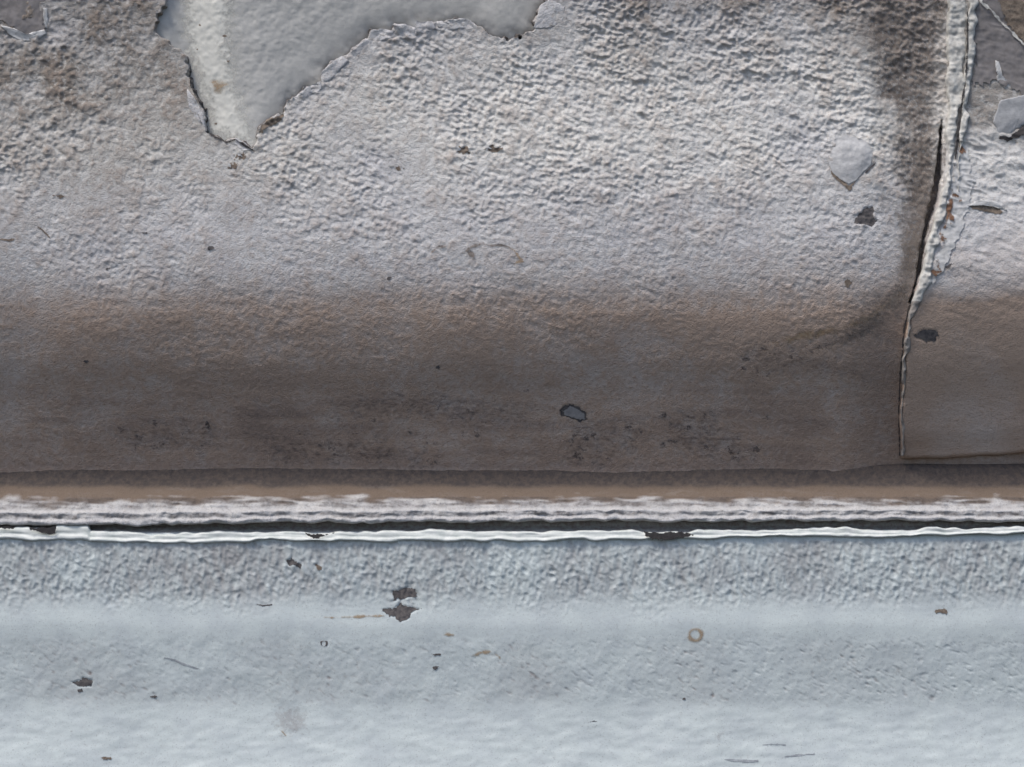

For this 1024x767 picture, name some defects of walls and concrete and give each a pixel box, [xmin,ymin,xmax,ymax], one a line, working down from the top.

peeling [157,0,565,169]
peeling [971,0,1024,142]
peeling [854,207,877,227]
water stain [850,0,945,337]
crack [898,0,1024,456]
peeling [914,329,939,343]
peeling [560,404,587,422]
peeling [382,587,422,622]